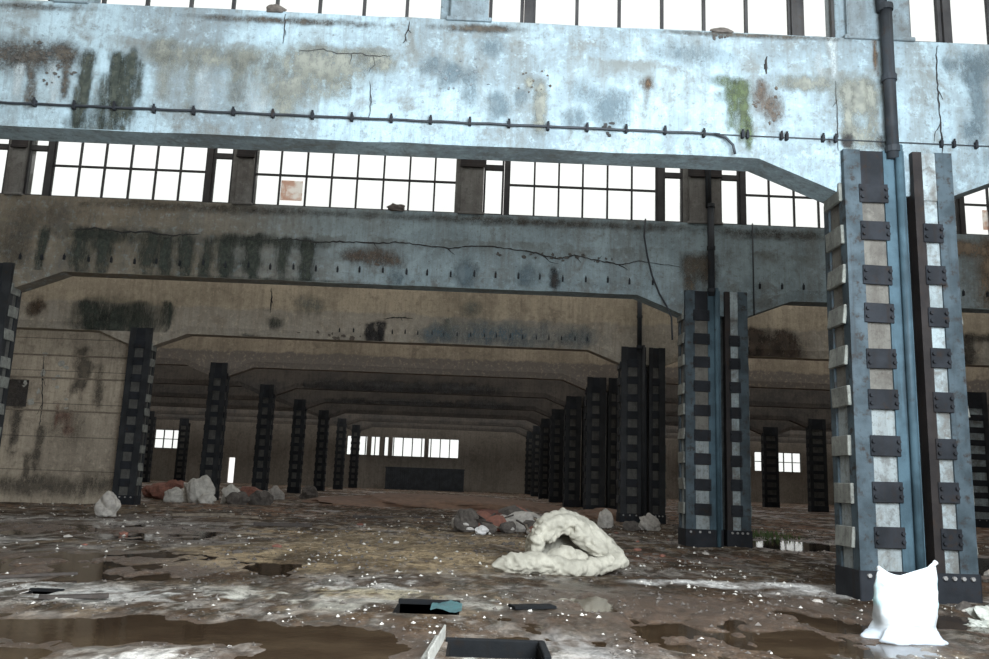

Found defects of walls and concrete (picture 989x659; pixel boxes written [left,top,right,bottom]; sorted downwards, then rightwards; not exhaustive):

water stain [715,77,753,149]
crack [934,48,943,152]
water stain [944,55,989,137]
crack [70,227,196,241]
water stain [70,227,314,281]
crack [223,238,679,270]
water stain [78,300,151,331]
water stain [163,302,173,331]
water stain [964,334,989,364]